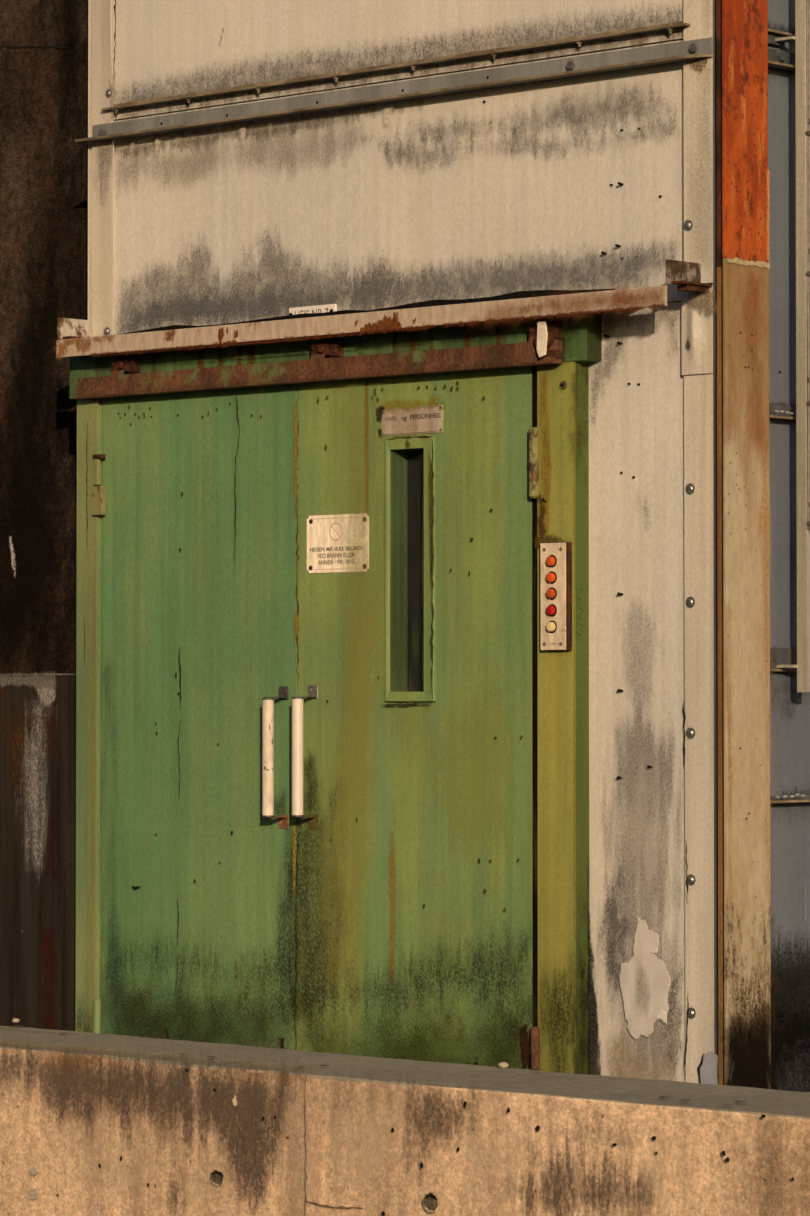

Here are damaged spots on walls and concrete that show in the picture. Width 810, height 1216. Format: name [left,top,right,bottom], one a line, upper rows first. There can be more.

damp [115,8,681,102]
damp [121,107,401,175]
damp [385,120,475,161]
damp [490,89,674,154]
rust [727,171,770,269]
rust [57,291,677,371]
damp [120,231,675,332]
rust [687,289,717,315]
damp [618,715,679,831]
damp [601,832,682,1072]
peeling [619,918,672,1039]
damp [2,1057,305,1208]